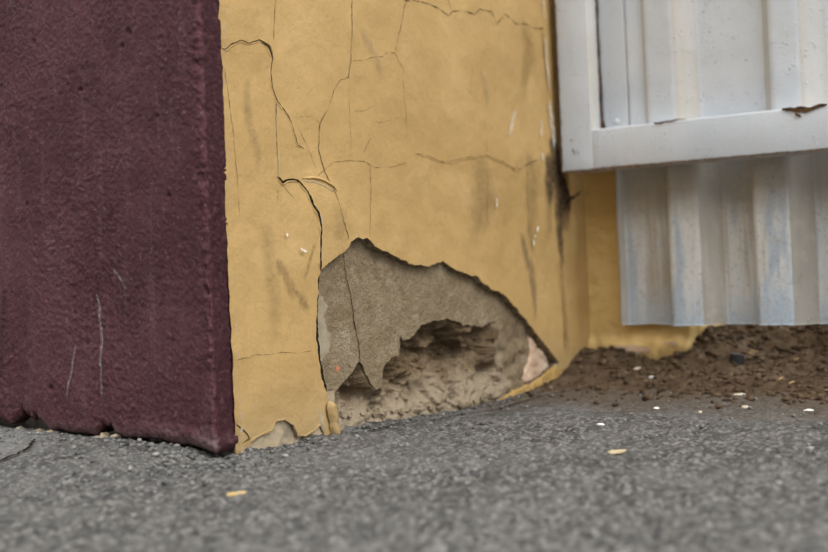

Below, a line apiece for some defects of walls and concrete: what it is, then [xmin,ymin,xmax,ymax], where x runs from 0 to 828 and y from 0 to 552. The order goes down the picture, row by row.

crack [221,0,543,391]
corrosion [782,104,827,117]
spalling [317,237,563,430]
peeling [251,418,325,449]